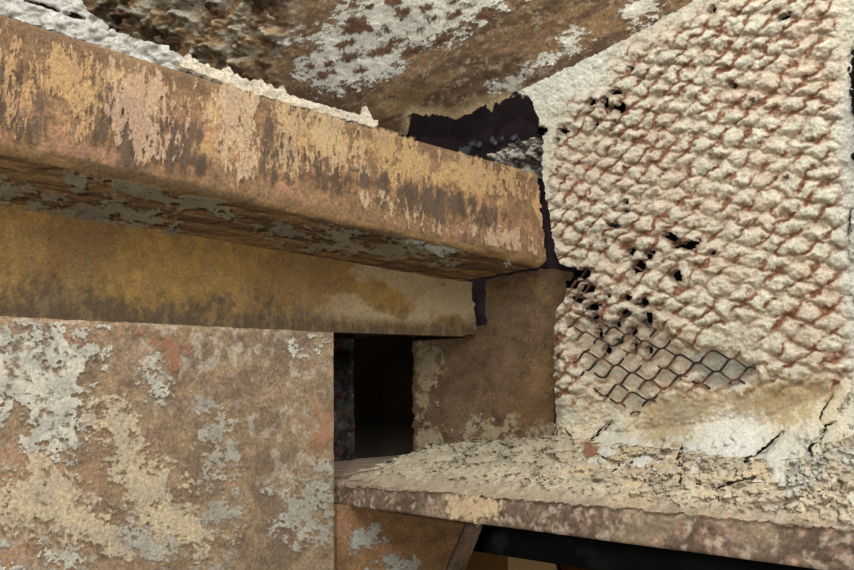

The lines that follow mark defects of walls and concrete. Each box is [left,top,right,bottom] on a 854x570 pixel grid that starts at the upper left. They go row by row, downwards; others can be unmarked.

rust [309,0,462,81]
peeling [271,0,511,99]
rust [475,4,501,21]
peeling [483,25,597,97]
peeling [618,0,666,30]
crack [846,49,854,114]
rust [0,21,543,254]
flaking render [665,233,701,250]
flaking render [565,269,611,337]
rust [503,347,556,433]
rust [308,402,332,451]
crack [808,395,833,456]